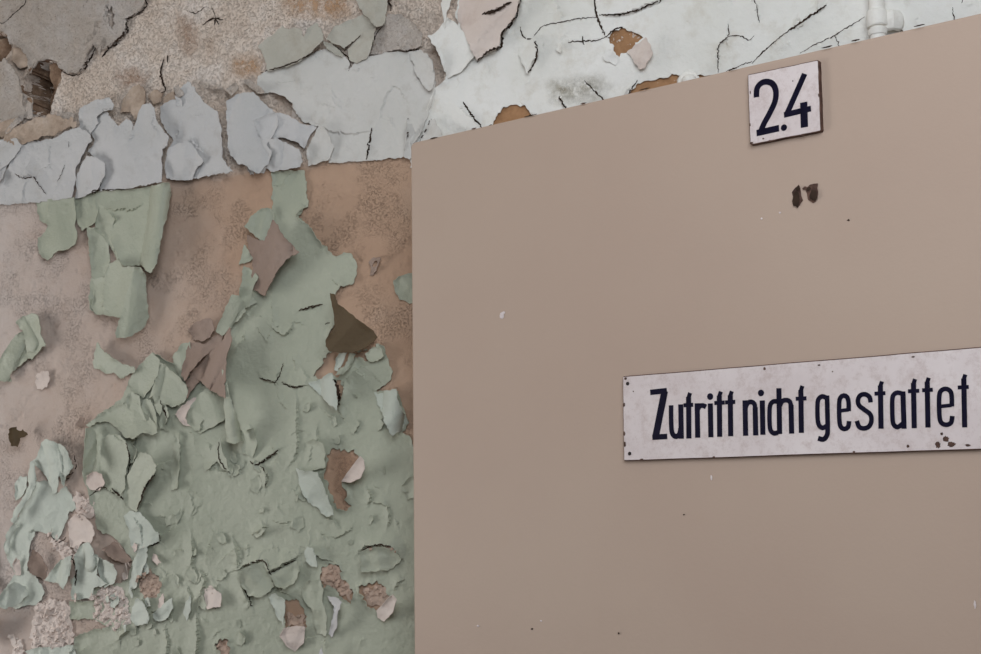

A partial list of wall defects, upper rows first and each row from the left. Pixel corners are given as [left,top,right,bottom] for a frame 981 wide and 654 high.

spalling [0,33,12,62]
crack [0,0,148,122]
peeling [225,0,870,175]
crack [477,0,661,73]
crack [717,0,827,72]
crack [804,17,864,51]
peeling [884,0,981,35]
peeling [0,59,234,338]
spalling [792,183,818,208]
peeling [0,170,415,654]